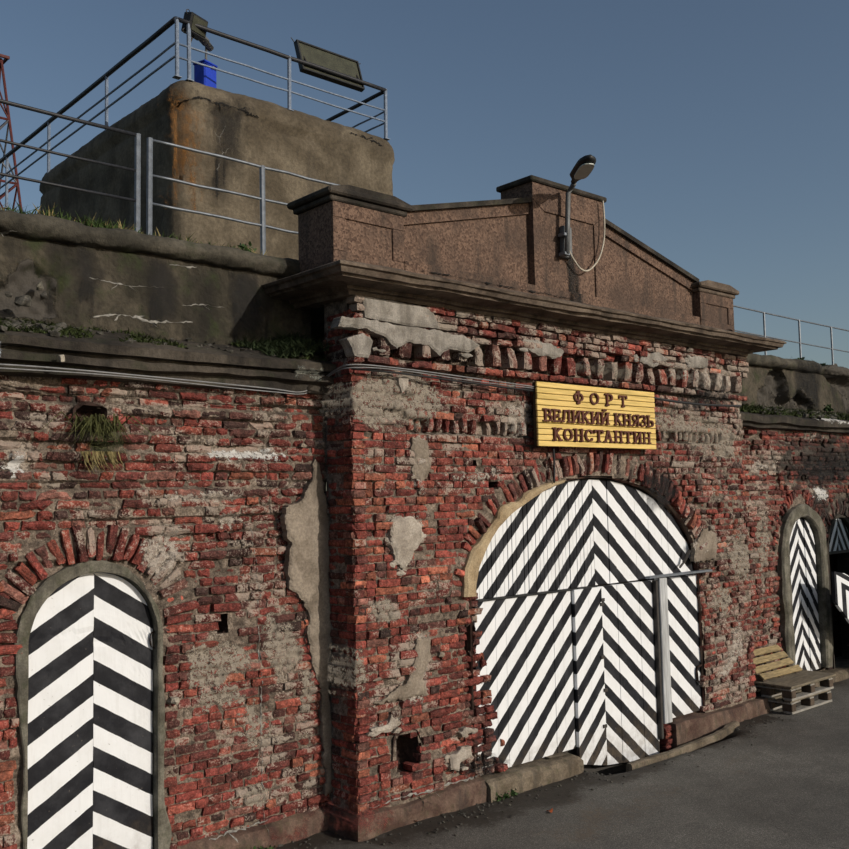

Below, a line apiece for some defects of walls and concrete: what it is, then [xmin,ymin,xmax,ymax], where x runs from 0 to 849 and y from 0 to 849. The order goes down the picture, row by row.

flaking render [330,296,480,359]
flaking render [517,339,564,359]
hole [214,613,228,634]